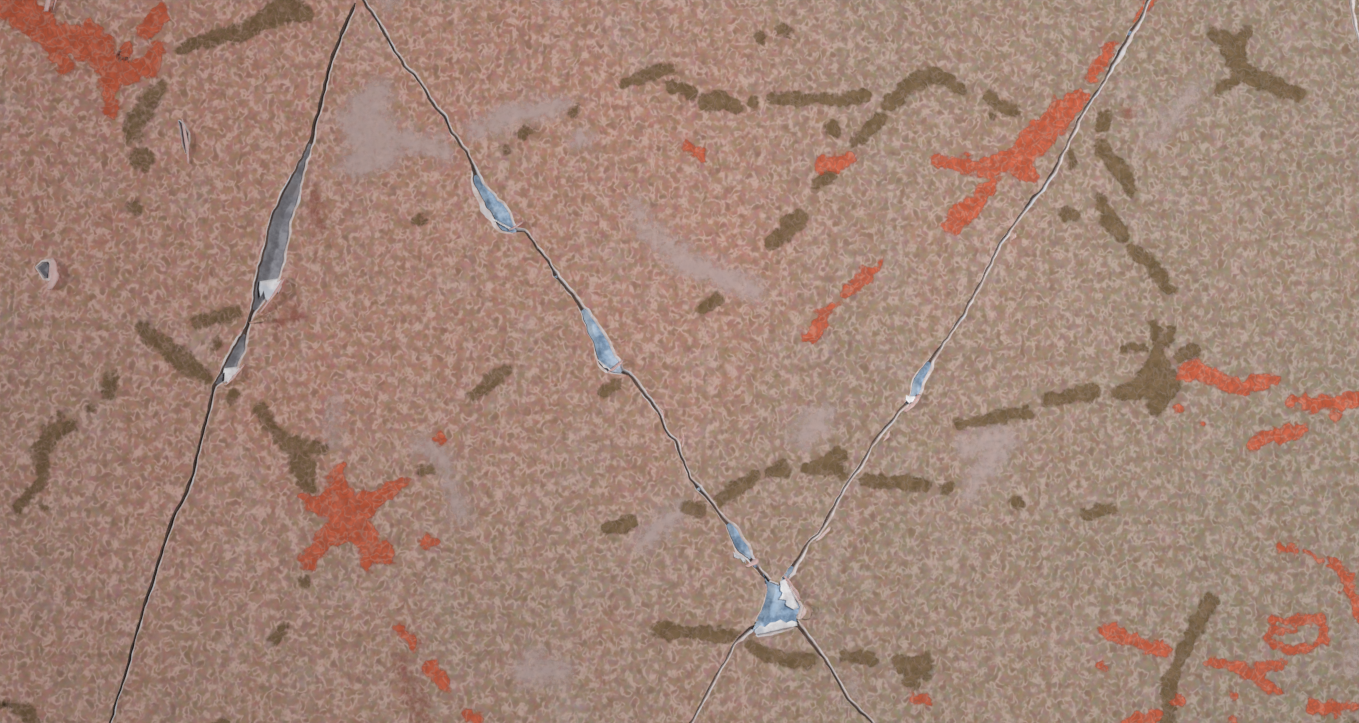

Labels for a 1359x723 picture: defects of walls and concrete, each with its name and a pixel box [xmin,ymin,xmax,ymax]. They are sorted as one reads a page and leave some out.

leakage [1207,27,1305,102]
flaking render [33,256,58,284]
crack [105,0,1157,723]
leakage [598,320,1281,550]
leakage [1246,391,1359,450]
leakage [1098,592,1330,723]